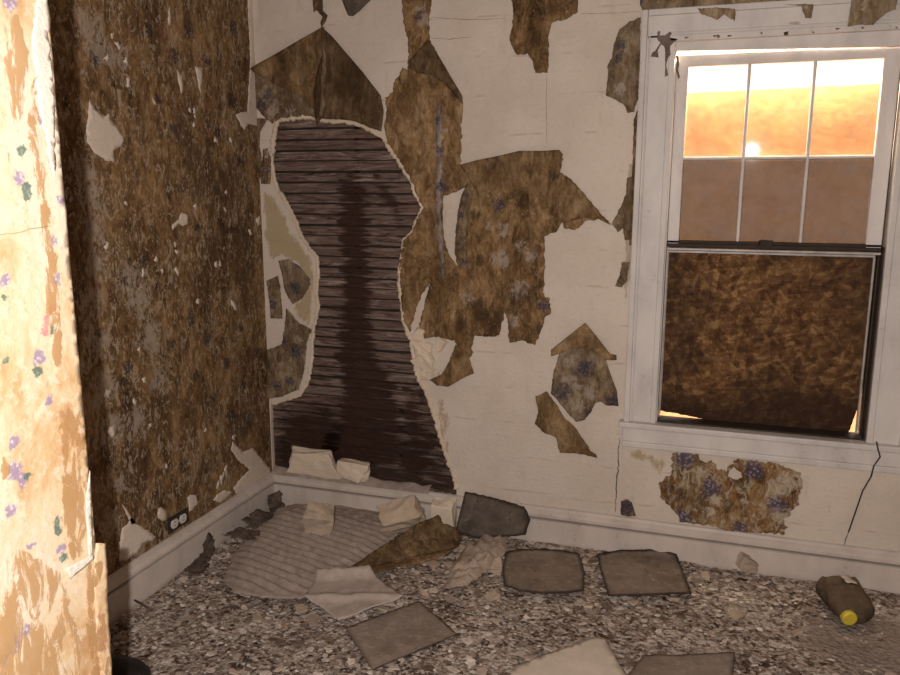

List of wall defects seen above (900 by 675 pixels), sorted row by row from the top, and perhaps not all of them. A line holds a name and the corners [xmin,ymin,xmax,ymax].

flaking render [86,100,125,162]
flaking render [213,0,459,502]
damp [276,173,436,479]
flaking render [119,504,156,561]
flaking render [157,507,168,521]
flaking render [187,495,199,512]
crack [613,438,621,510]